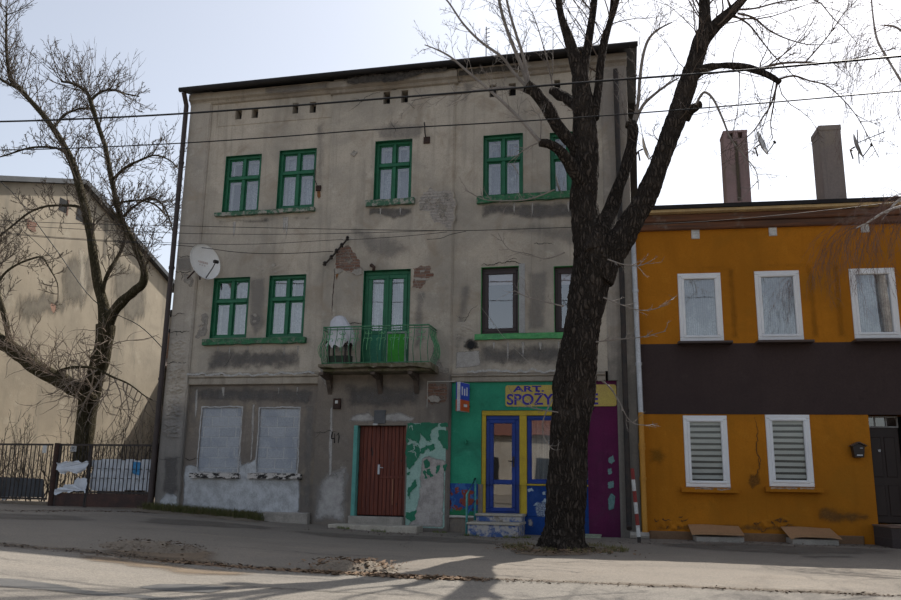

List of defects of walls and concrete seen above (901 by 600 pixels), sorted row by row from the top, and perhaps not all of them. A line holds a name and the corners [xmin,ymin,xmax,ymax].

water stain [484,202,571,218]
spalling [334,244,364,276]
spalling [411,264,435,290]
peeling [528,488,546,526]